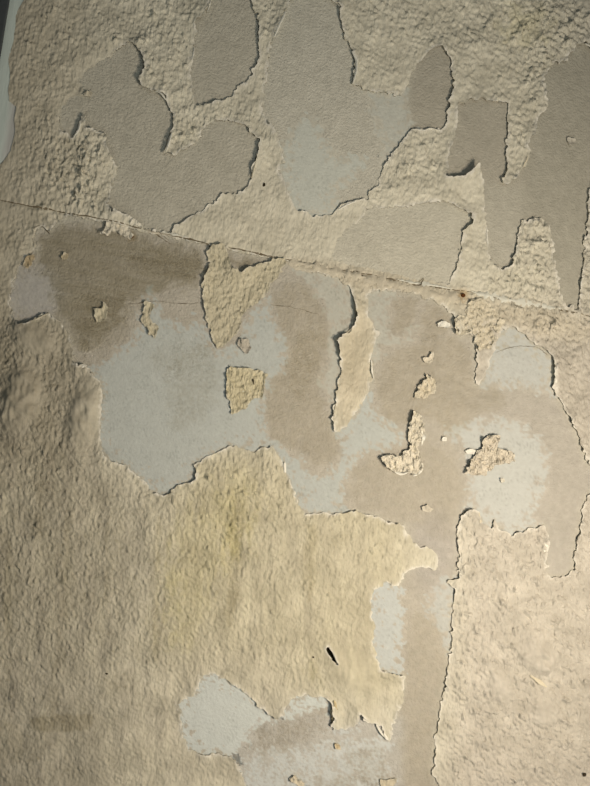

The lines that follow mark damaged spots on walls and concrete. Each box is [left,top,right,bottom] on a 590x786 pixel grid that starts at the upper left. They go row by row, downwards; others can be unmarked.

peeling [59,42,260,232]
crack [1,200,590,317]
peeling [190,0,590,310]
peeling [9,216,590,786]